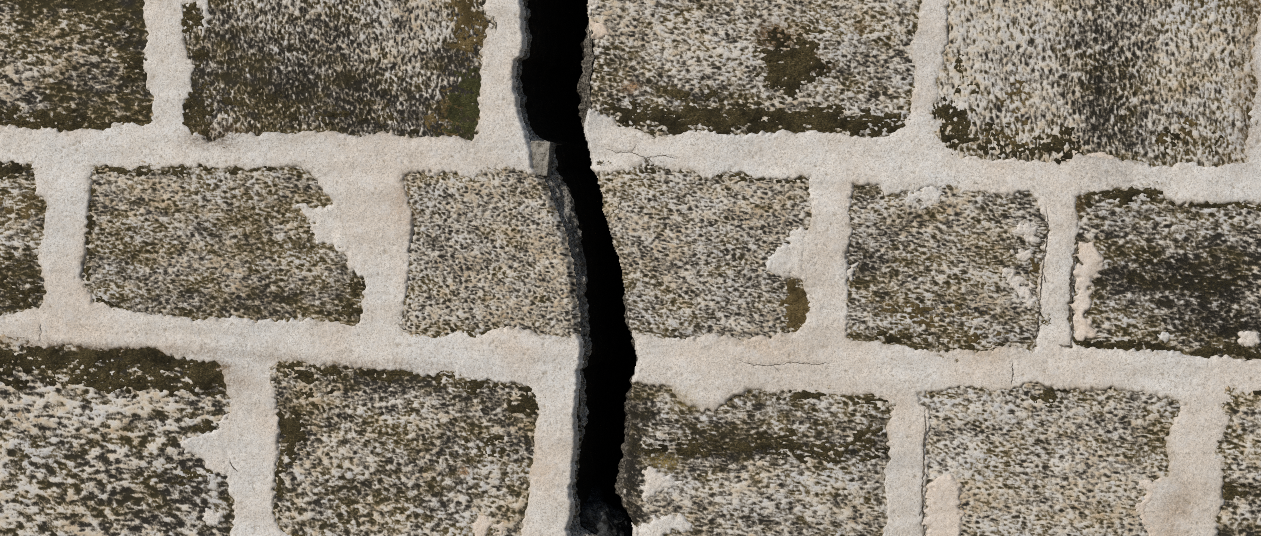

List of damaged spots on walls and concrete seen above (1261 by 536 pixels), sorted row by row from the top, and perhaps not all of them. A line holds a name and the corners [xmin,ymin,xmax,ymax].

crack [515,0,673,536]